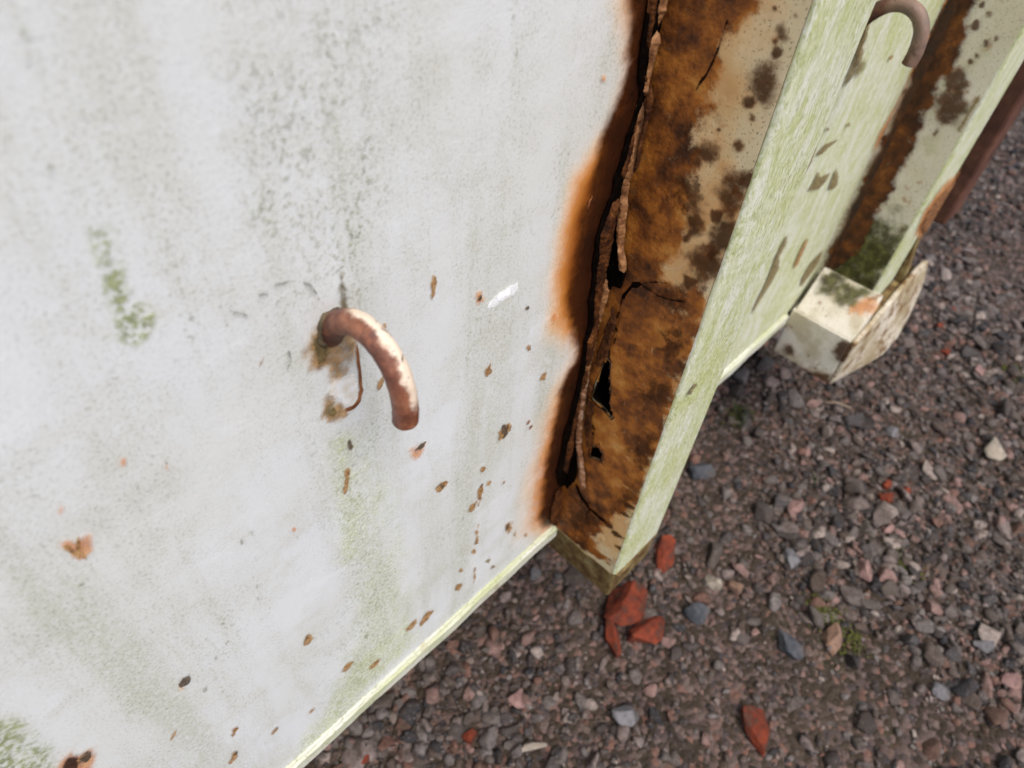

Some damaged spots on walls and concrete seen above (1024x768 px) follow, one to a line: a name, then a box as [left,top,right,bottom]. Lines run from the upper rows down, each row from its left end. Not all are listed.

crack [696,20,728,90]
peeling [805,128,839,191]
corrosion [824,0,998,271]
crack [550,0,683,527]
corrosion [535,0,759,564]
peeling [753,235,788,312]
peeling [794,240,824,286]
water stain [830,219,908,291]
corrosion [306,335,363,422]
peeling [64,537,91,559]